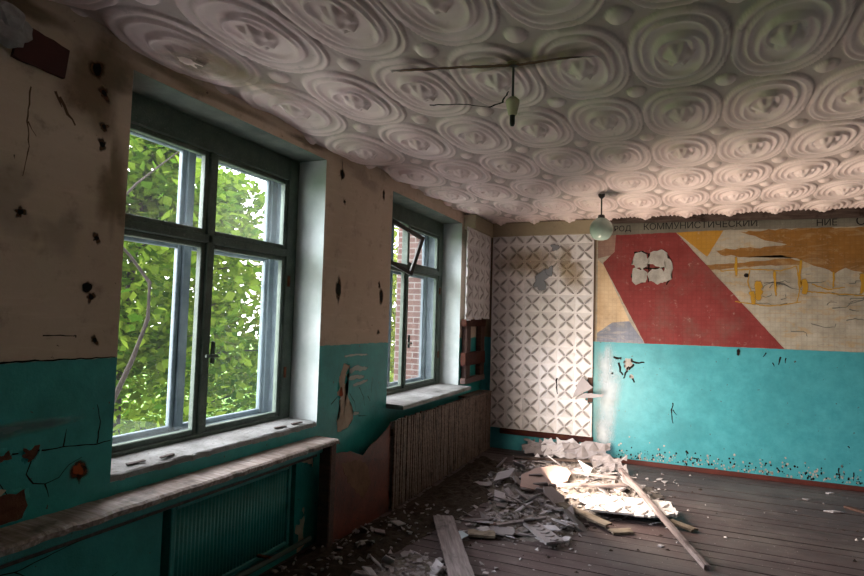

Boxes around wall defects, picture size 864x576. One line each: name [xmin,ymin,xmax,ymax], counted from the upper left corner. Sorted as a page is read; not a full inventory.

crack [22,86,36,176]
crack [54,91,76,126]
peeling [611,356,645,383]
peeling [336,363,353,432]
crack [12,404,111,497]
peeling [616,436,863,485]
flaking render [0,488,30,528]